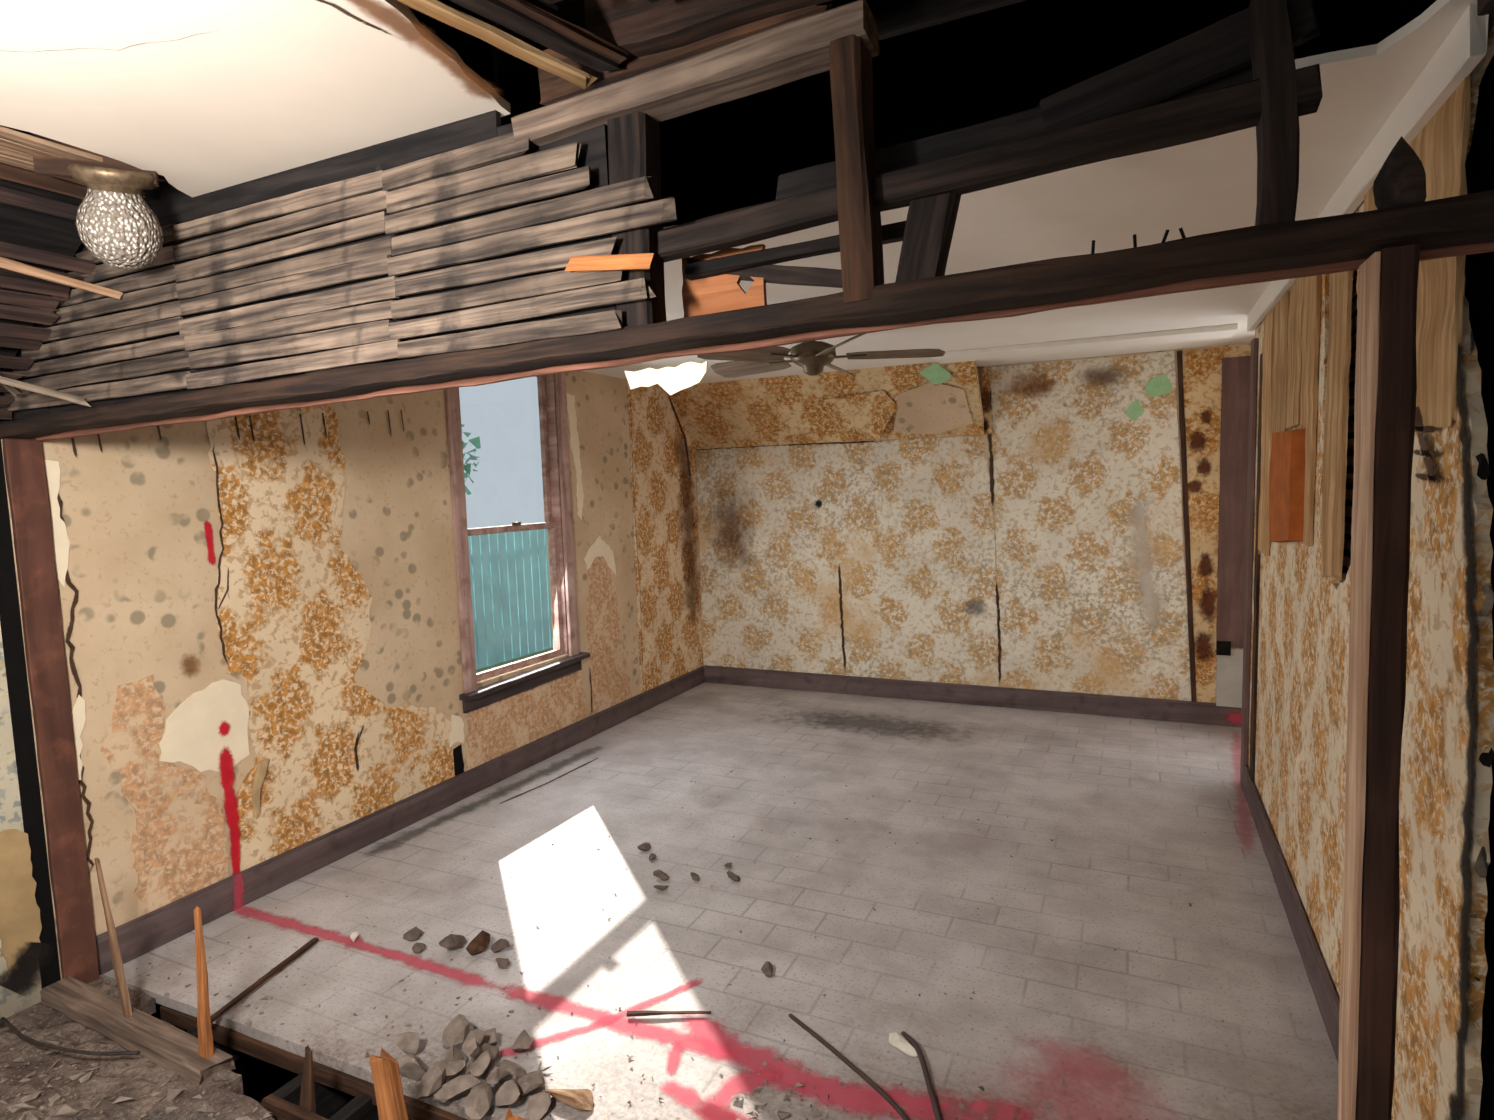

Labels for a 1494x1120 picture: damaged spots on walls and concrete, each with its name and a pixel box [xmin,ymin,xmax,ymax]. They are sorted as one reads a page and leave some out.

crack [316,0,389,34]
rust [1188,411,1212,493]
rust [1196,553,1217,661]
flaking render [159,679,250,772]
spalling [450,715,465,776]
flaking render [1446,331,1494,1120]